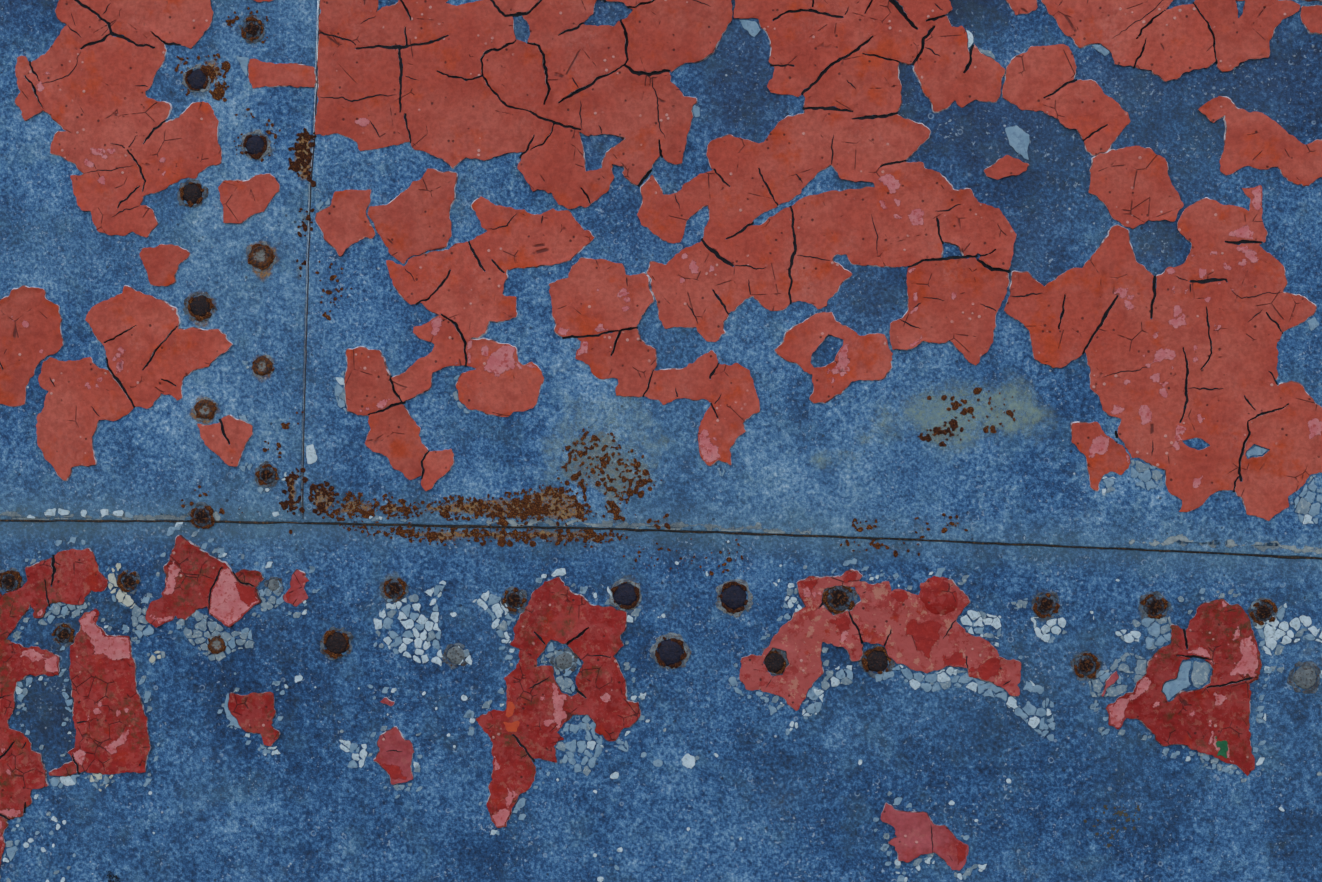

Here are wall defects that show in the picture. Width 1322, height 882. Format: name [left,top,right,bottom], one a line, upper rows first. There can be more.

rust [175,53,317,187]
rust [226,7,269,44]
peeling [0,0,233,481]
crack [0,0,1322,559]
peeling [237,0,1322,524]
crack [45,555,56,607]
crack [208,568,255,612]
rust [255,411,748,614]
rust [917,387,1016,447]
crack [0,742,26,759]
peeling [0,522,320,882]
peeling [461,568,663,835]